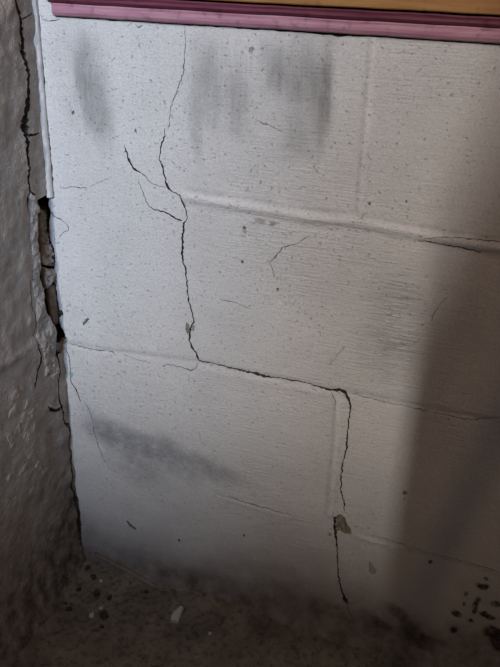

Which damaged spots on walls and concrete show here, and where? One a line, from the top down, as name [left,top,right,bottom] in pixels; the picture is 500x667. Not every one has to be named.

crack [15,0,60,205]
flaking render [27,194,68,382]
crack [124,32,500,647]